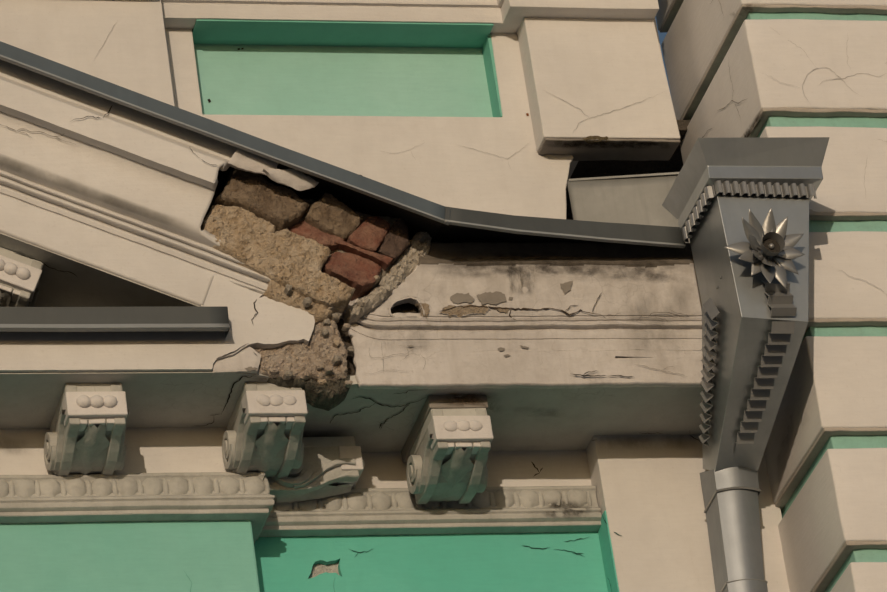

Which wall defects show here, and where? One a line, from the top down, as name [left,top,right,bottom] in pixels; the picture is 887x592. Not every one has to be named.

crack [3,106,112,145]
spalling [201,148,432,411]
flaking render [560,281,573,294]
flaking render [415,291,513,318]
crack [439,294,619,320]
crack [573,365,688,377]
crack [330,390,426,428]
crack [522,537,588,556]
spalling [308,562,339,579]